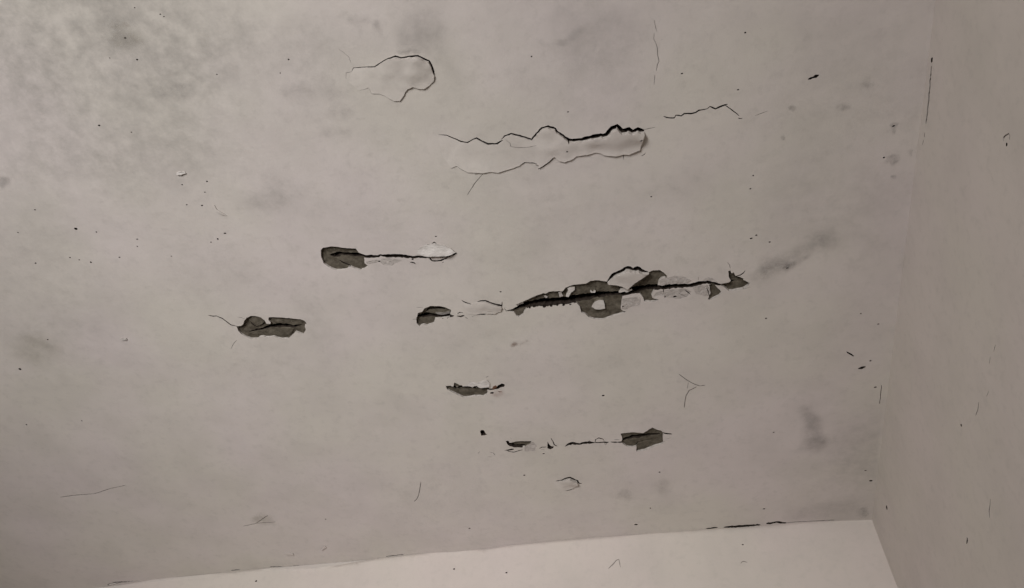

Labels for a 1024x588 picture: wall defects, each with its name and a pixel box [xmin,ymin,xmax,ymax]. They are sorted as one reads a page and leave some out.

crack [663,104,764,119]
flaking render [321,236,457,270]
flaking render [416,262,749,326]
flaking render [209,315,307,348]
flaking render [446,376,505,398]
flaking render [506,428,671,454]